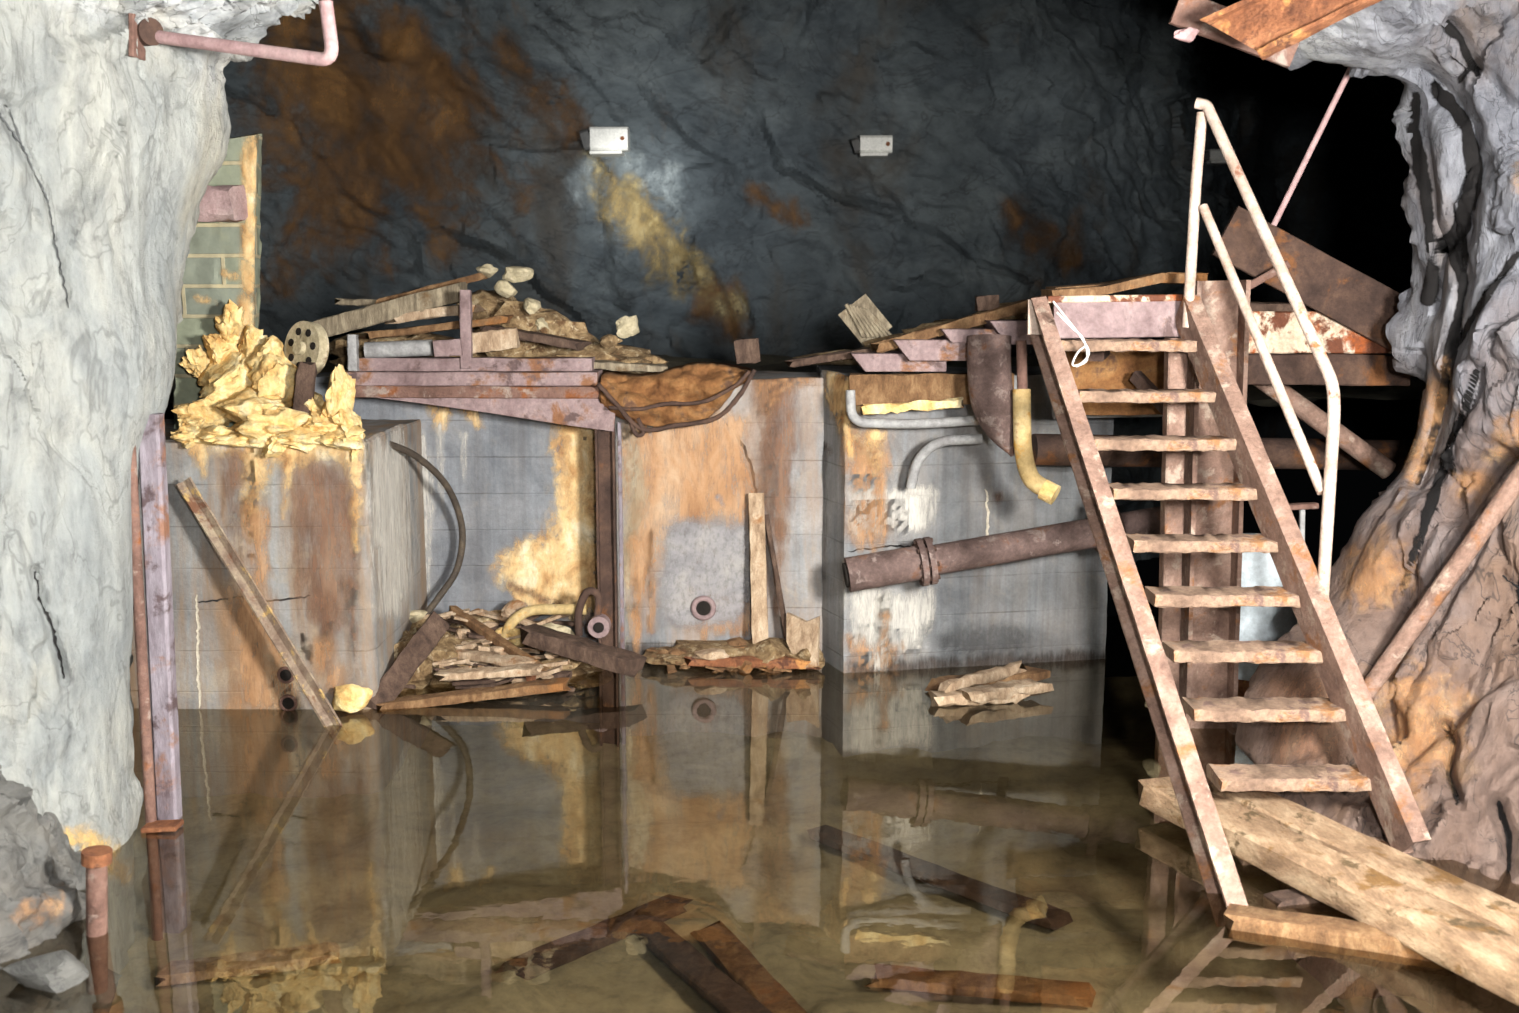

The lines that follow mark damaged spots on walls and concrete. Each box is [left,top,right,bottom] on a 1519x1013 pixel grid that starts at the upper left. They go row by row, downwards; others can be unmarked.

corrosion [170,0,501,709]
corrosion [622,371,890,646]